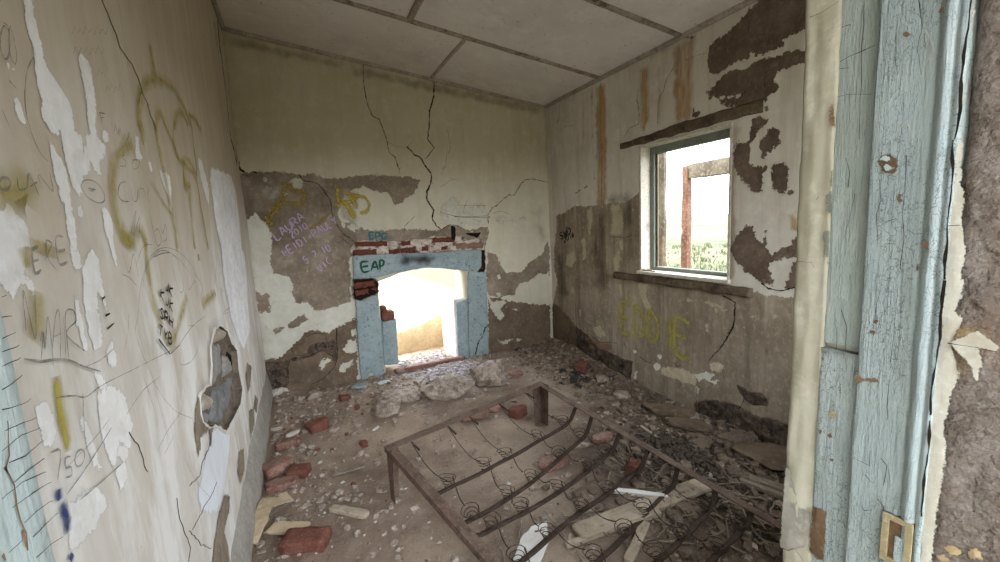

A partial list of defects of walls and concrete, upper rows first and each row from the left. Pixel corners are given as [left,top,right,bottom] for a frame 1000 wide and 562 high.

peeling [23,0,118,368]
crack [363,65,451,231]
corrosion [591,86,606,205]
peeling [706,0,806,196]
peeling [0,202,35,300]
peeling [240,171,797,447]
crack [709,296,736,361]
peeling [35,400,57,447]
peeling [79,371,133,491]
spalling [194,325,258,562]
peeling [67,486,107,550]
spalling [937,545,983,562]